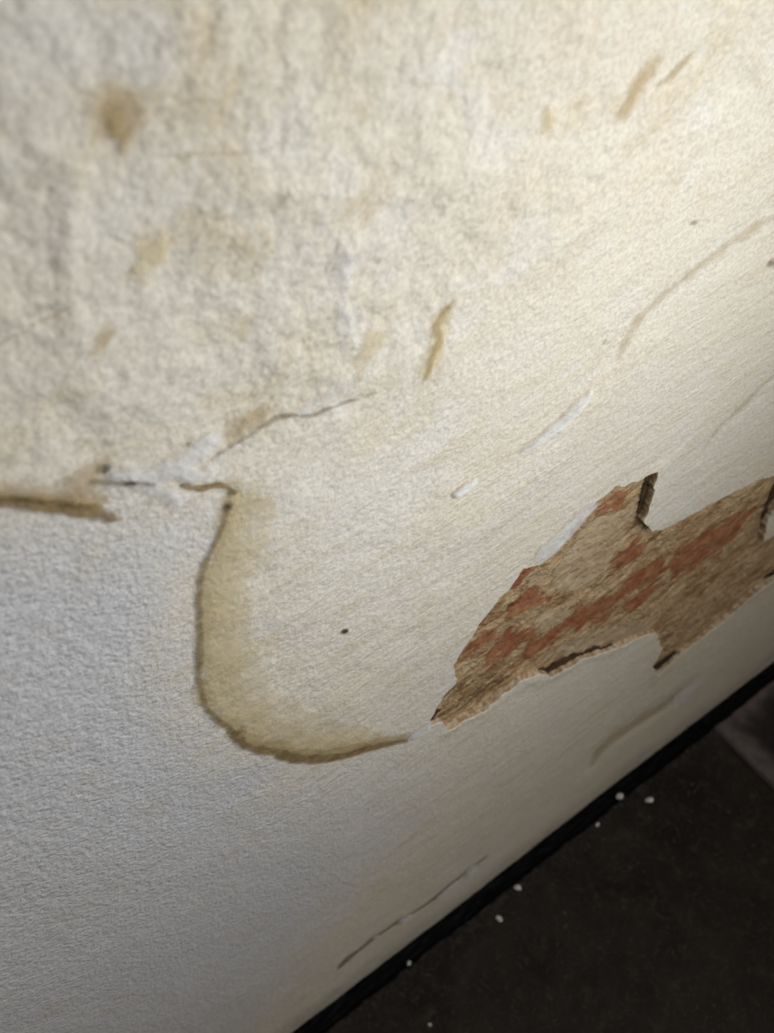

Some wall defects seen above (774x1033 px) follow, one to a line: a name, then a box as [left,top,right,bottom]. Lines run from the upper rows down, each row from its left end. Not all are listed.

leakage [0,491,118,522]
leakage [199,490,247,669]
crack [182,483,408,764]
spalling [430,472,774,731]
leakage [196,682,383,757]